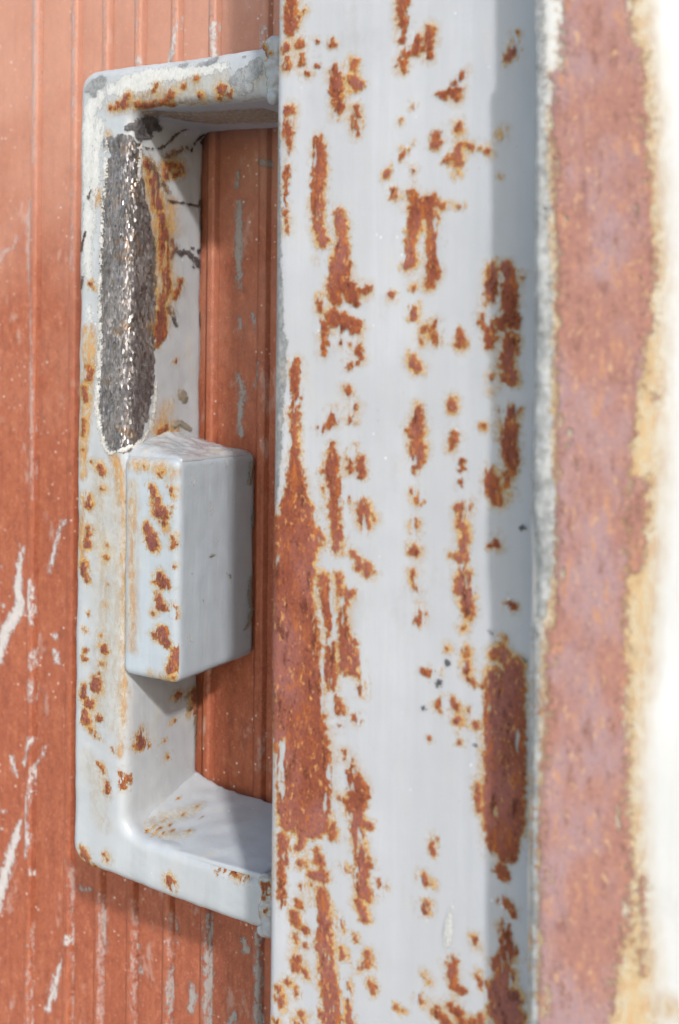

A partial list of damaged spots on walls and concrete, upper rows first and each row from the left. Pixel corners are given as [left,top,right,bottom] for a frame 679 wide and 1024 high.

corrosion [141,146,188,348]
peeling [80,55,263,455]
corrosion [109,73,297,236]
corrosion [263,0,367,138]
corrosion [394,0,438,75]
corrosion [381,143,470,376]
corrosion [79,326,179,627]
corrosion [155,394,187,436]
corrosion [215,134,387,1024]
corrosion [416,0,664,1024]
corrosion [392,1001,408,1015]